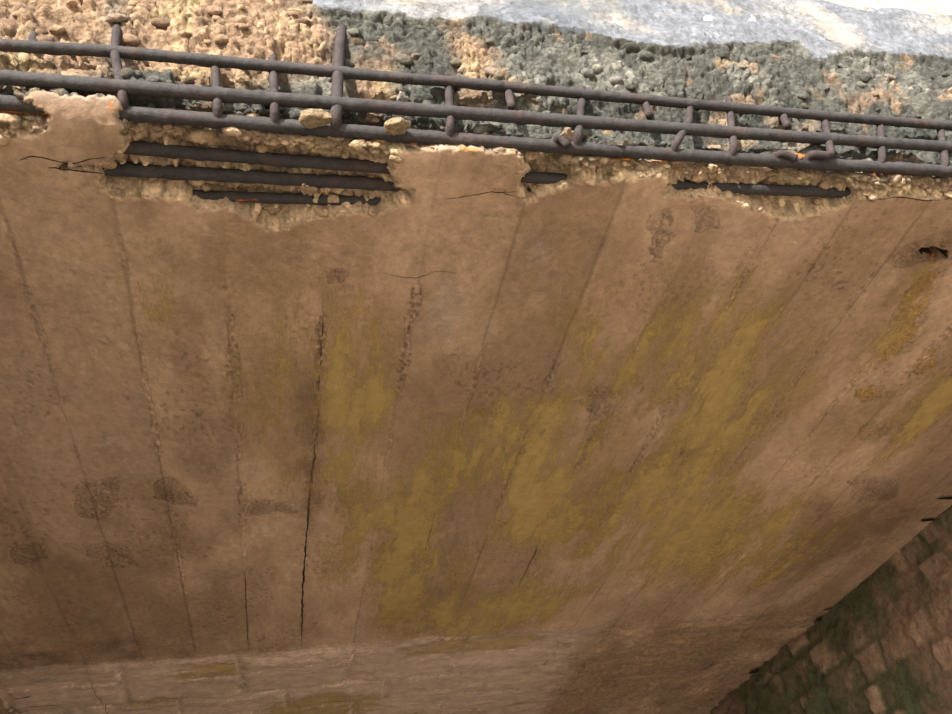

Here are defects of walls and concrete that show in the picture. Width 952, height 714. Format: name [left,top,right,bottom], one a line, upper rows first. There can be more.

crack [21,156,114,176]
spalling [0,0,952,232]
crack [301,306,324,643]
damp [263,279,850,655]
damp [886,375,952,460]
crack [243,576,251,649]